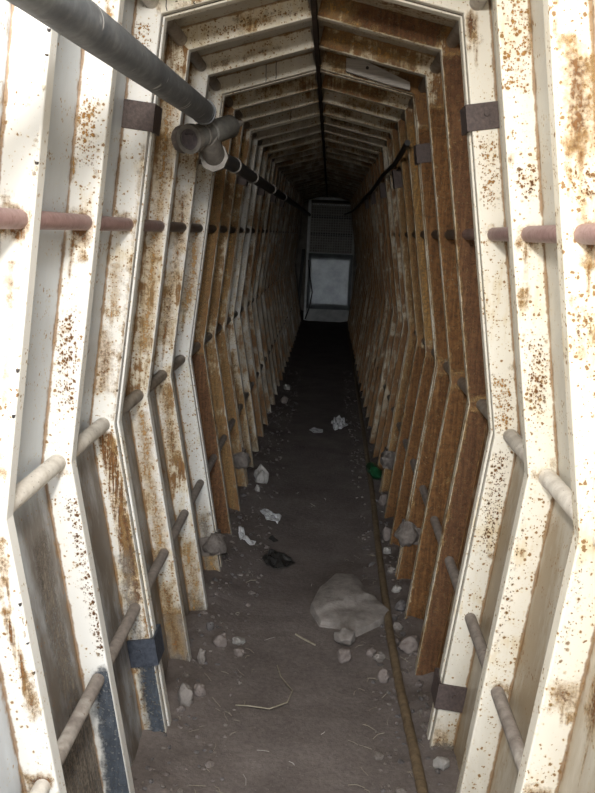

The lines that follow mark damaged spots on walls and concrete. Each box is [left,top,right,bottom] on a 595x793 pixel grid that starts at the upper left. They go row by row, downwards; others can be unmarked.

corrosion [326,0,445,48]
corrosion [0,215,33,241]
corrosion [516,165,539,199]
corrosion [561,50,595,203]
corrosion [582,245,595,291]
corrosion [99,432,143,603]
corrosion [139,412,165,558]
corrosion [192,353,231,534]
corrosion [217,338,256,453]
corrosion [383,10,514,675]
corrosion [524,336,548,411]
corrosion [553,678,595,732]